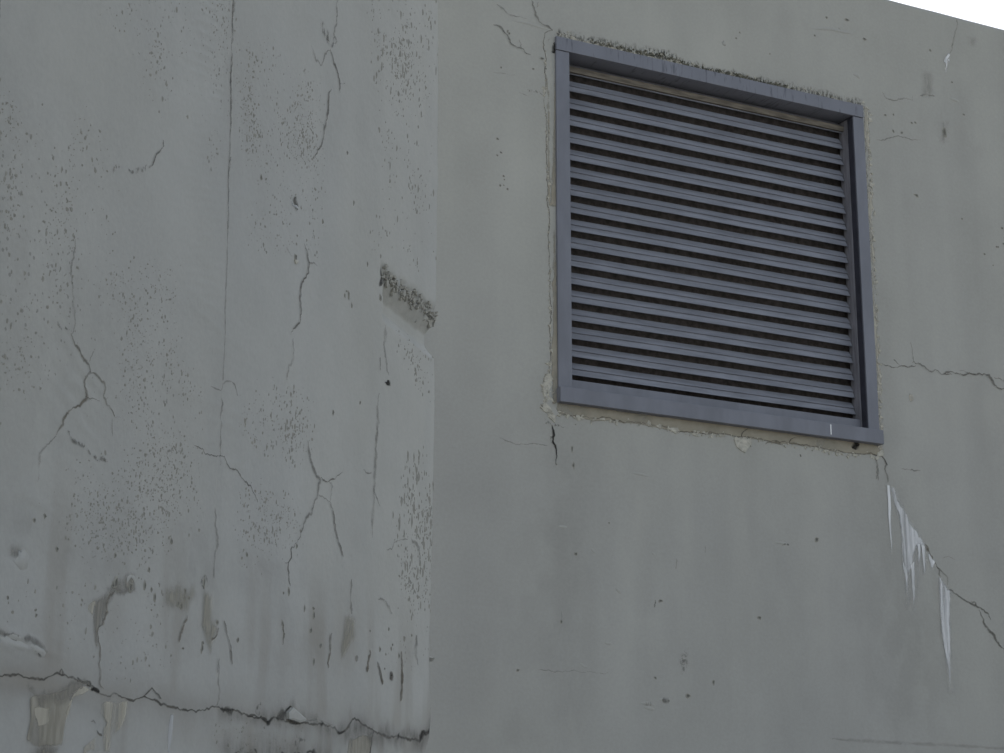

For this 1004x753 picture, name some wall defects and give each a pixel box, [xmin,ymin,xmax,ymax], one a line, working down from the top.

crack [315,23,340,156]
spalling [371,0,438,214]
spalling [379,254,438,328]
spalling [532,37,884,460]
crack [60,327,106,461]
crack [891,360,1004,389]
crack [288,506,343,584]
damp [887,485,935,595]
damp [940,578,950,664]
crack [924,544,1002,648]
damp [27,682,89,753]
crack [0,669,429,753]